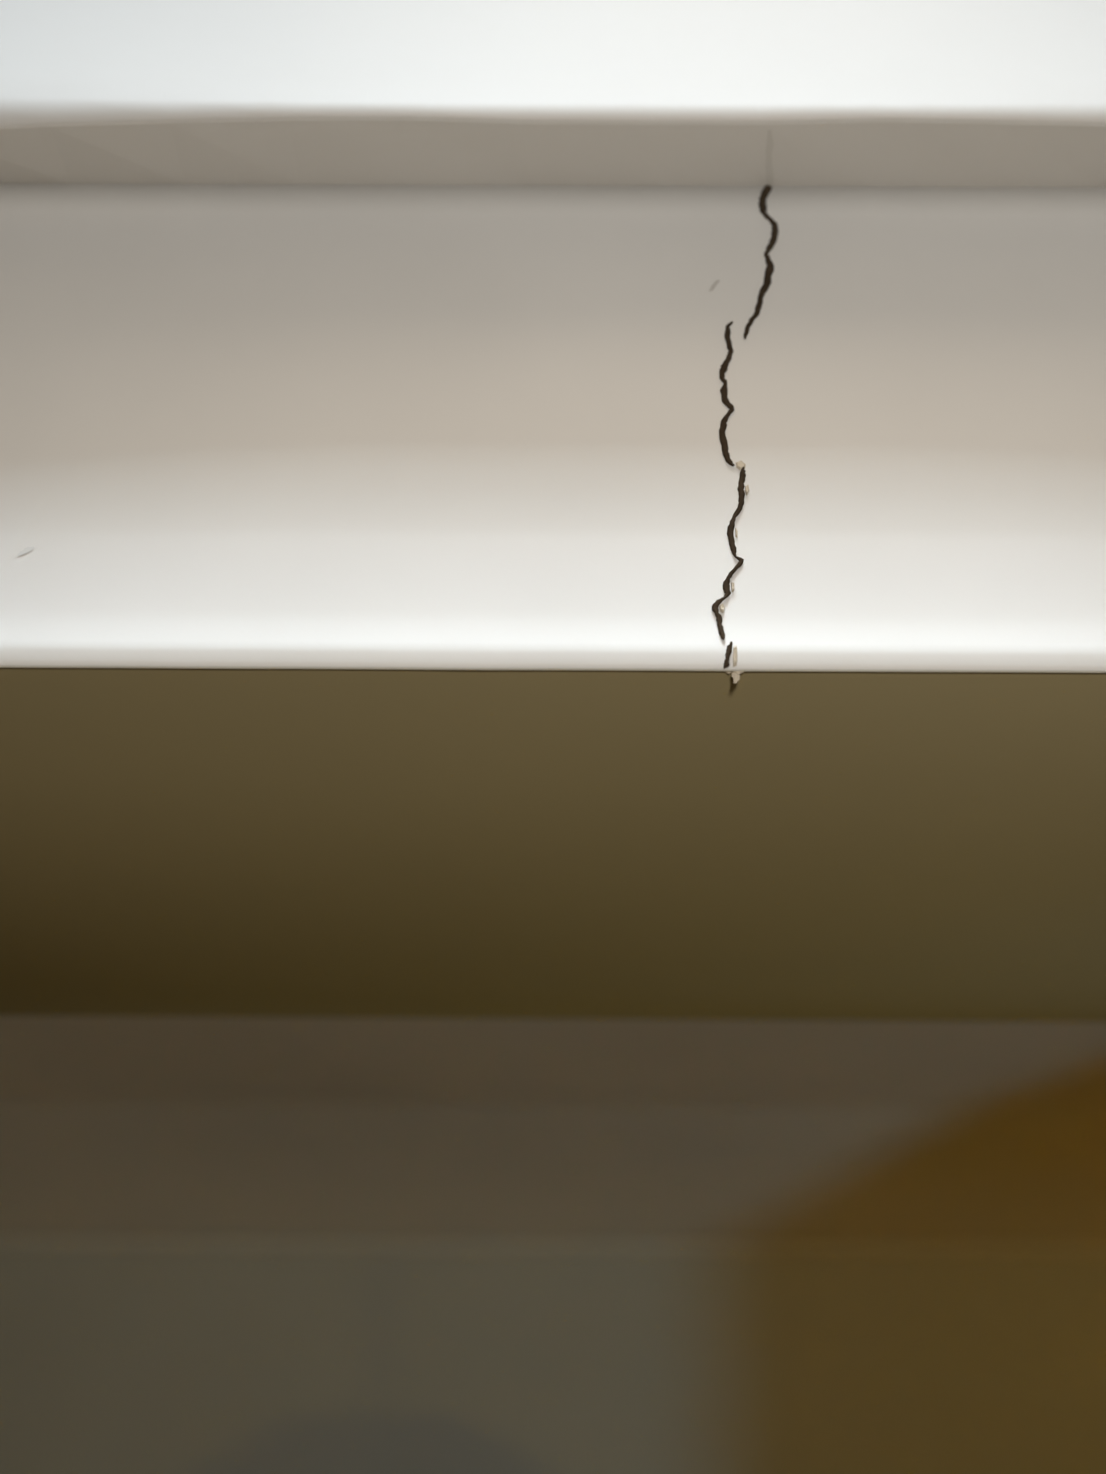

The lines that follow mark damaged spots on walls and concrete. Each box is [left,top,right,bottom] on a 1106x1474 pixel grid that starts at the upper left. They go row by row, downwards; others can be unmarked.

crack [712,185,779,669]